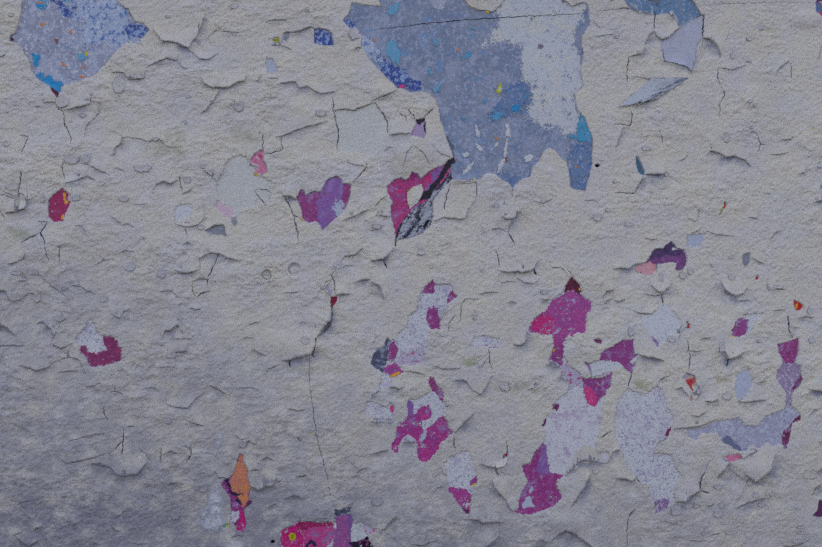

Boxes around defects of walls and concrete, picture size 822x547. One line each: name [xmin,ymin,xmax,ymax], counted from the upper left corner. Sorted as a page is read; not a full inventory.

crack [368,13,576,31]
peeling [0,0,205,137]
peeling [186,67,246,114]
crack [375,103,434,132]
peeling [40,148,110,222]
crack [20,223,60,262]
peeling [174,150,271,274]
crack [255,189,300,239]
peeling [265,0,592,463]
peeling [52,320,123,394]
peeling [279,505,376,547]